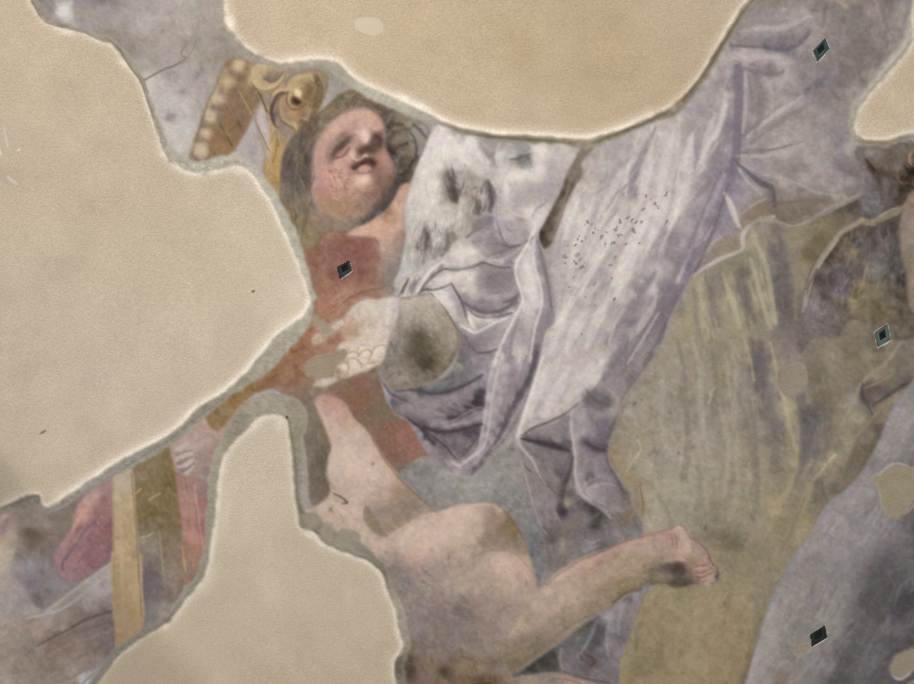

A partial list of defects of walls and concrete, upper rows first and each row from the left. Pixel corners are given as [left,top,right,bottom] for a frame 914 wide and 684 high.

flaking render [215,0,755,149]
flaking render [848,4,914,147]
flaking render [0,0,316,515]
flaking render [89,391,411,684]